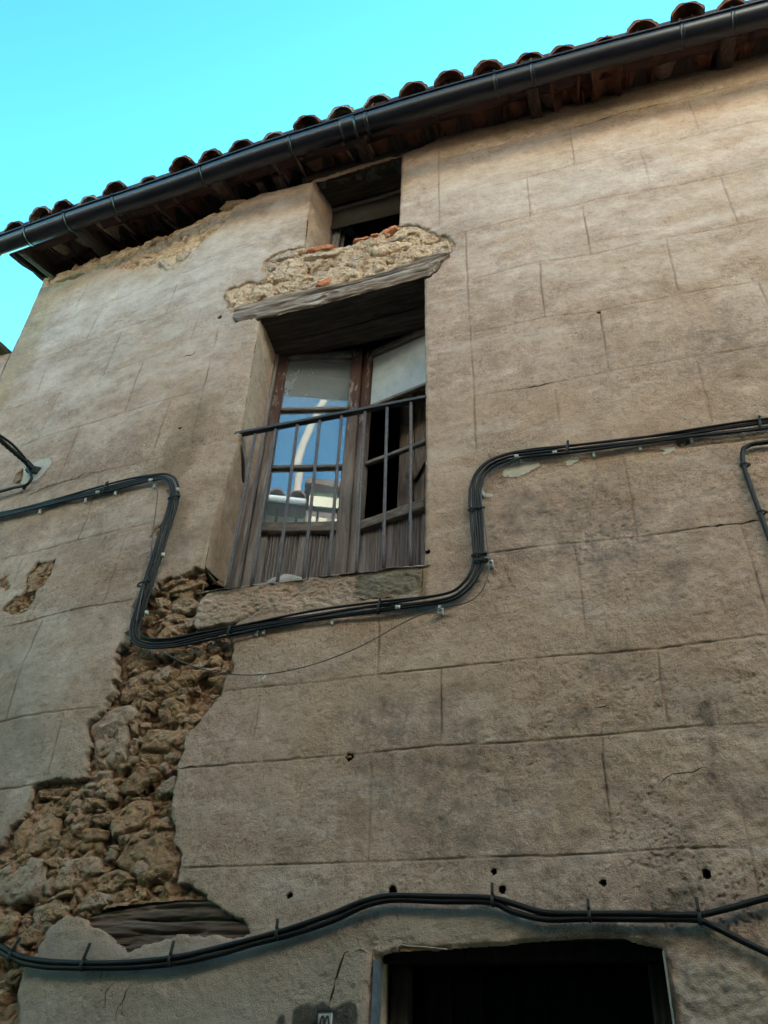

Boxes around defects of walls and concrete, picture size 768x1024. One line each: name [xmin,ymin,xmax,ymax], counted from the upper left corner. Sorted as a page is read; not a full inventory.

spalling [41,209,233,288]
spalling [224,225,455,314]
spalling [0,560,234,1024]
crack [660,767,706,784]
crack [329,949,366,1005]